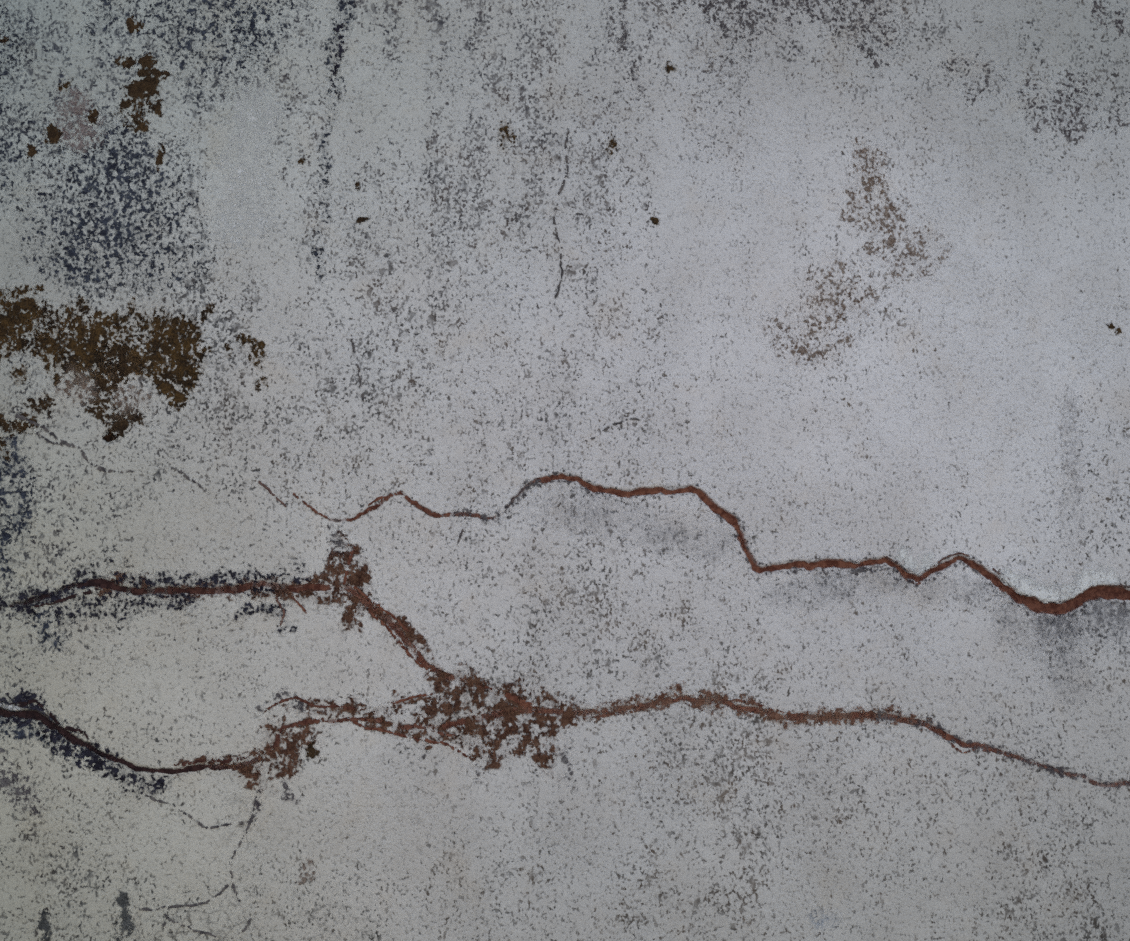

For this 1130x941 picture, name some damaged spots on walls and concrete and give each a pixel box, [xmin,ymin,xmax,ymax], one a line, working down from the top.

rust [126,15,144,33]
damp [86,0,295,89]
rust [114,52,170,134]
damp [319,0,356,188]
rust [25,123,63,159]
damp [0,5,208,295]
damp [311,202,331,283]
rust [0,284,268,462]
crack [15,414,134,473]
crack [168,466,206,492]
crack [585,418,650,441]
crack [0,471,1130,939]